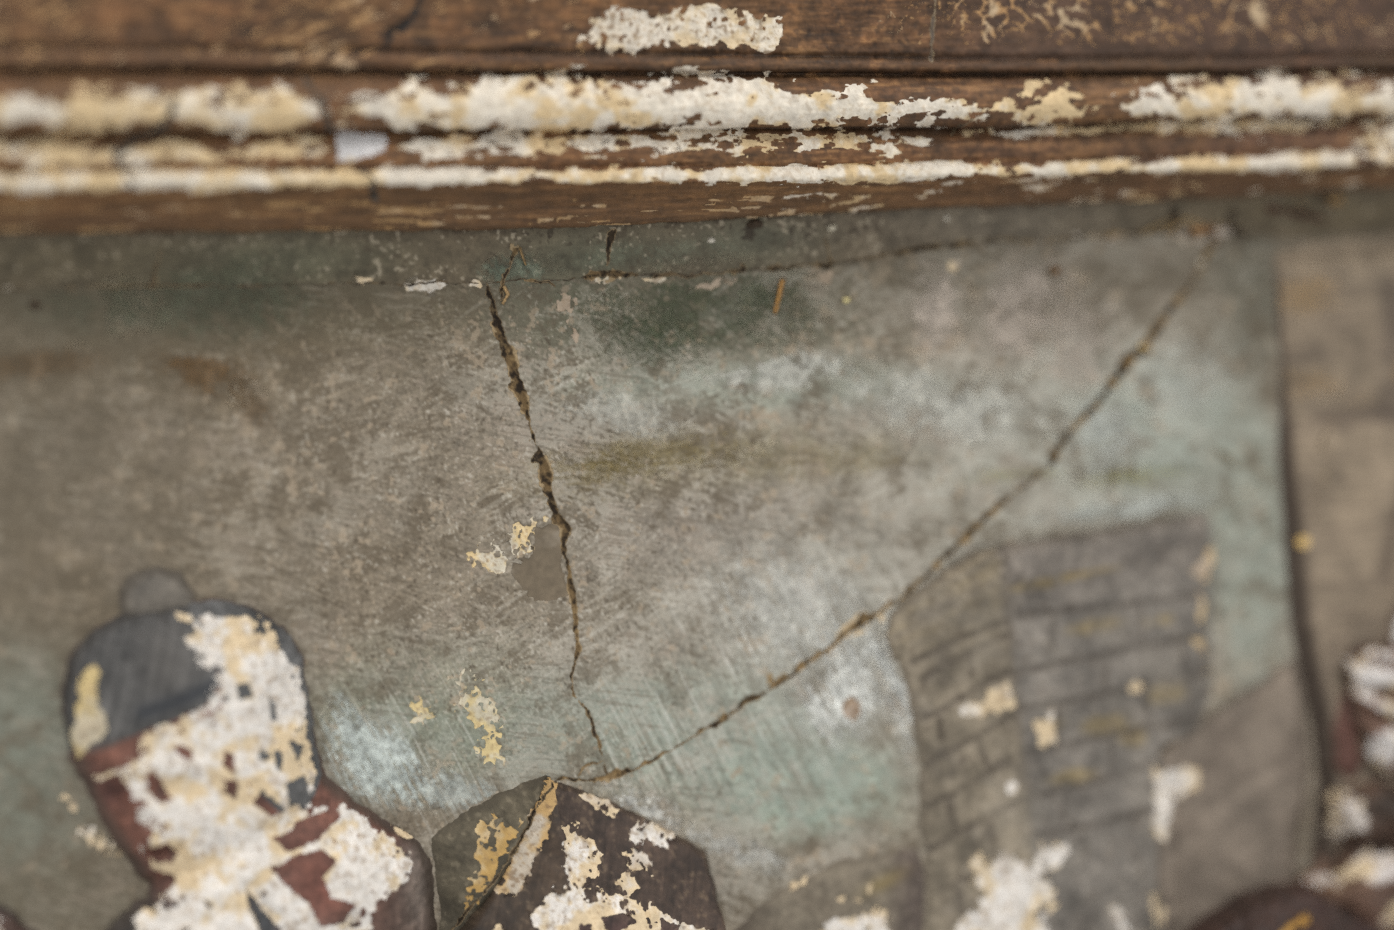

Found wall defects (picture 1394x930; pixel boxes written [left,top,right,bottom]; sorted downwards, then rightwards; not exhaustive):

peeling [0,0,1394,233]
flaking render [466,516,569,601]
crack [0,226,1253,930]
peeling [409,668,513,766]
peeling [1344,645,1394,772]
peeling [60,612,413,930]
peeling [464,777,715,930]
spalling [789,874,814,891]
peeling [820,883,894,930]
peeling [955,842,1070,930]
peeling [1109,899,1131,930]
peeling [1304,790,1394,888]